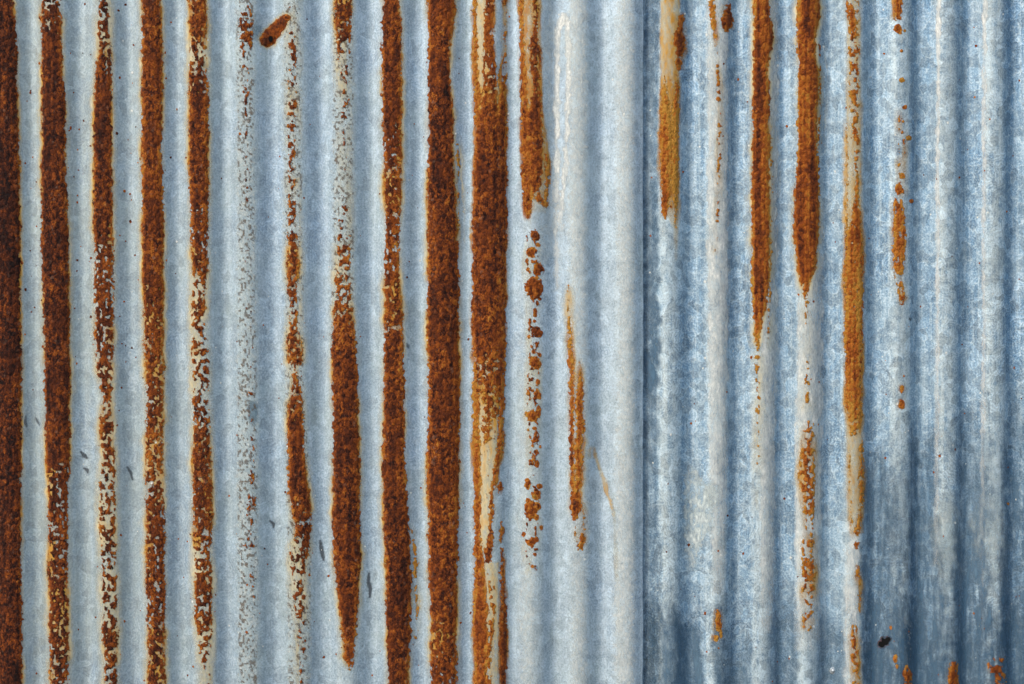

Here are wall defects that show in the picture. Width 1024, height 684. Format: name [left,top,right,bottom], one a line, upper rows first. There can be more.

corrosion [0,0,364,684]
corrosion [379,0,551,684]
corrosion [564,285,613,551]
corrosion [651,0,687,228]
corrosion [737,0,776,465]
corrosion [797,420,819,631]
corrosion [786,0,869,549]
corrosion [850,624,862,684]
corrosion [855,565,863,612]